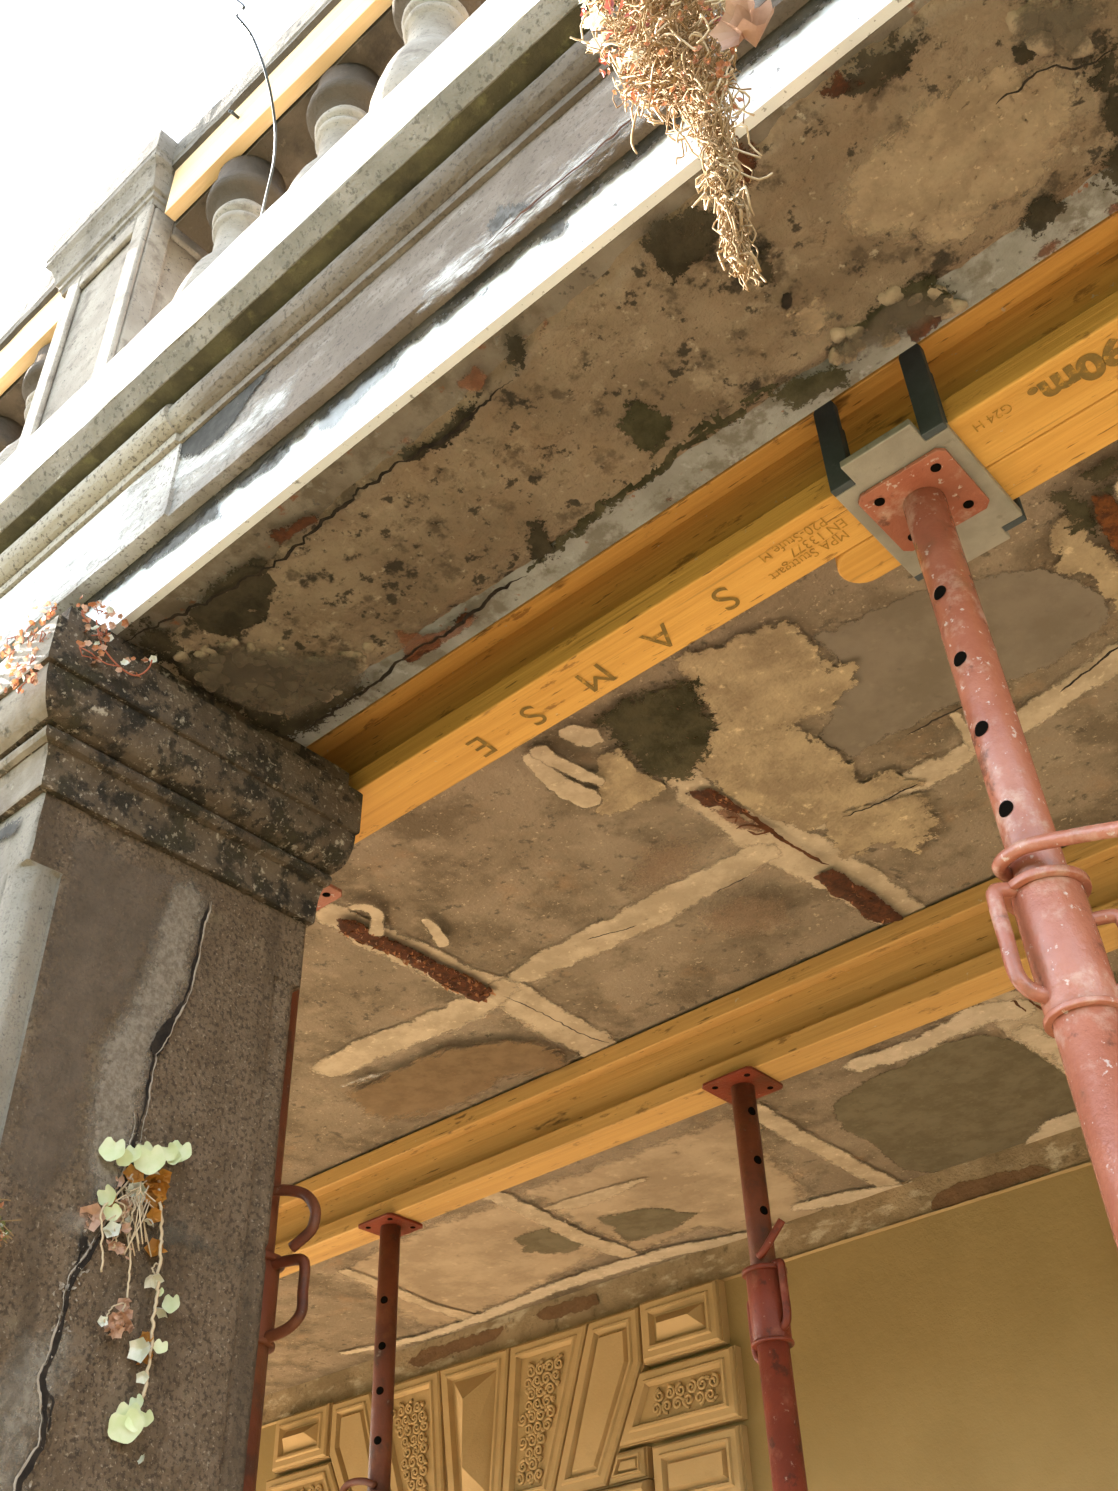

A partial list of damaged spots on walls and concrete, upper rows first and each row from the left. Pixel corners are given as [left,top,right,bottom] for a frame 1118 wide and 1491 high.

crack [122,380,513,644]
crack [308,576,526,729]
crack [13,902,212,1491]